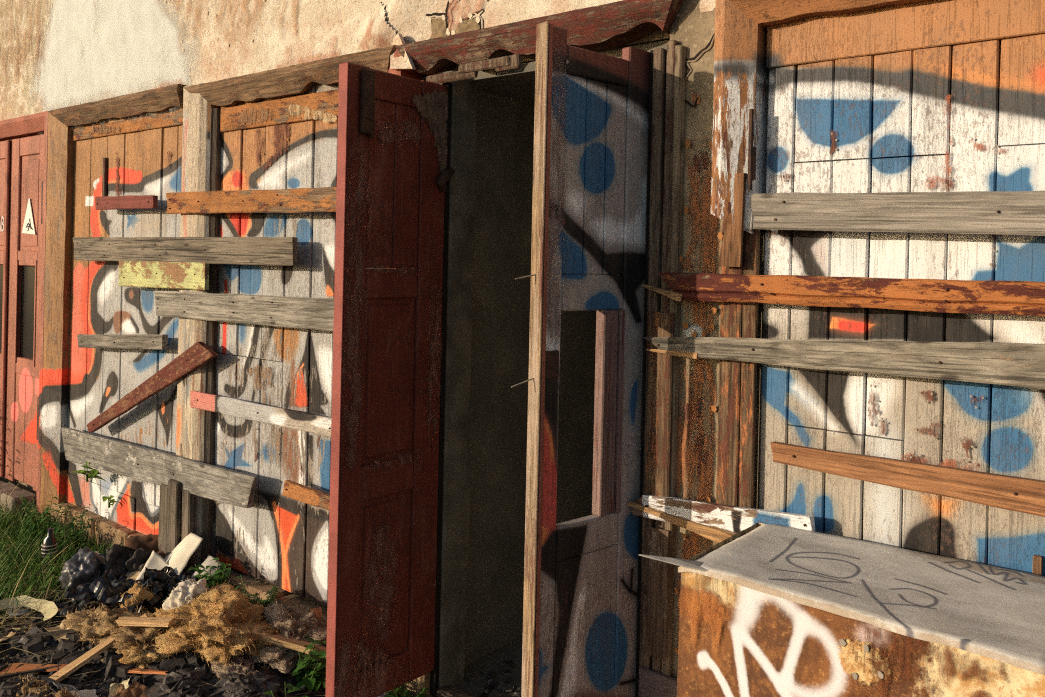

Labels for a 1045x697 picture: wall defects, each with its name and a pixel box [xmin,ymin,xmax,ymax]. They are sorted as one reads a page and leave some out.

spalling [426,0,487,40]